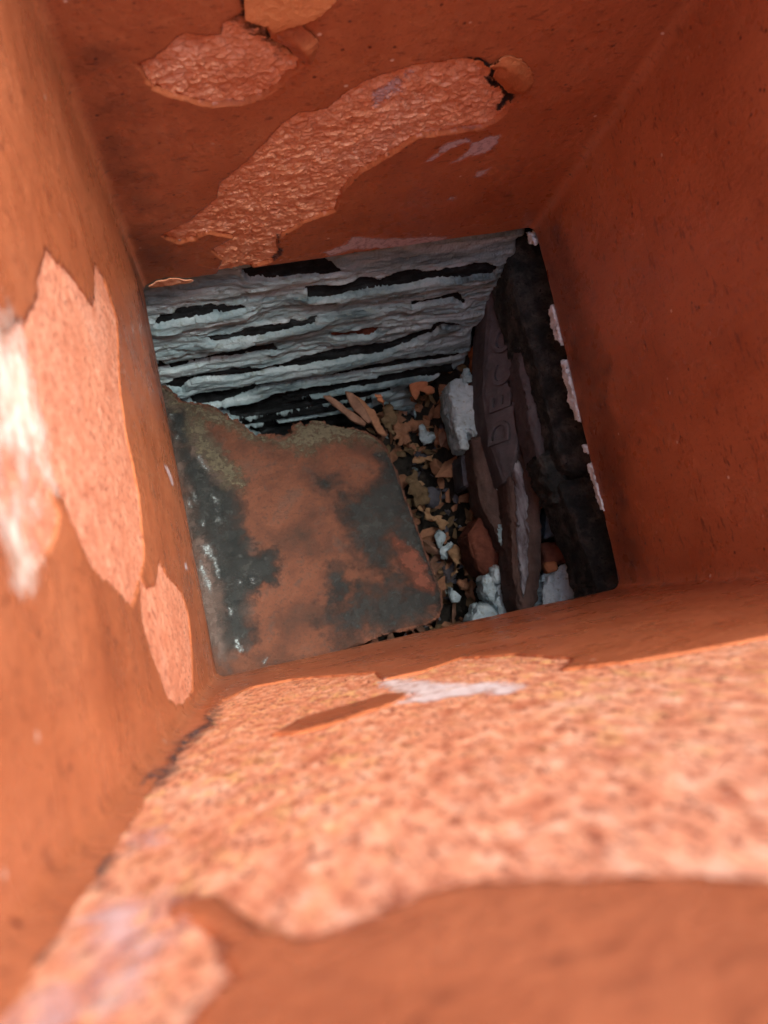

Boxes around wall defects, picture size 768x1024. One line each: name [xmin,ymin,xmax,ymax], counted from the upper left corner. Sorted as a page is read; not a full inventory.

spalling [141,0,337,102]
spalling [164,55,535,270]
spalling [0,250,193,705]
spalling [161,385,443,676]
spalling [0,639,768,1024]